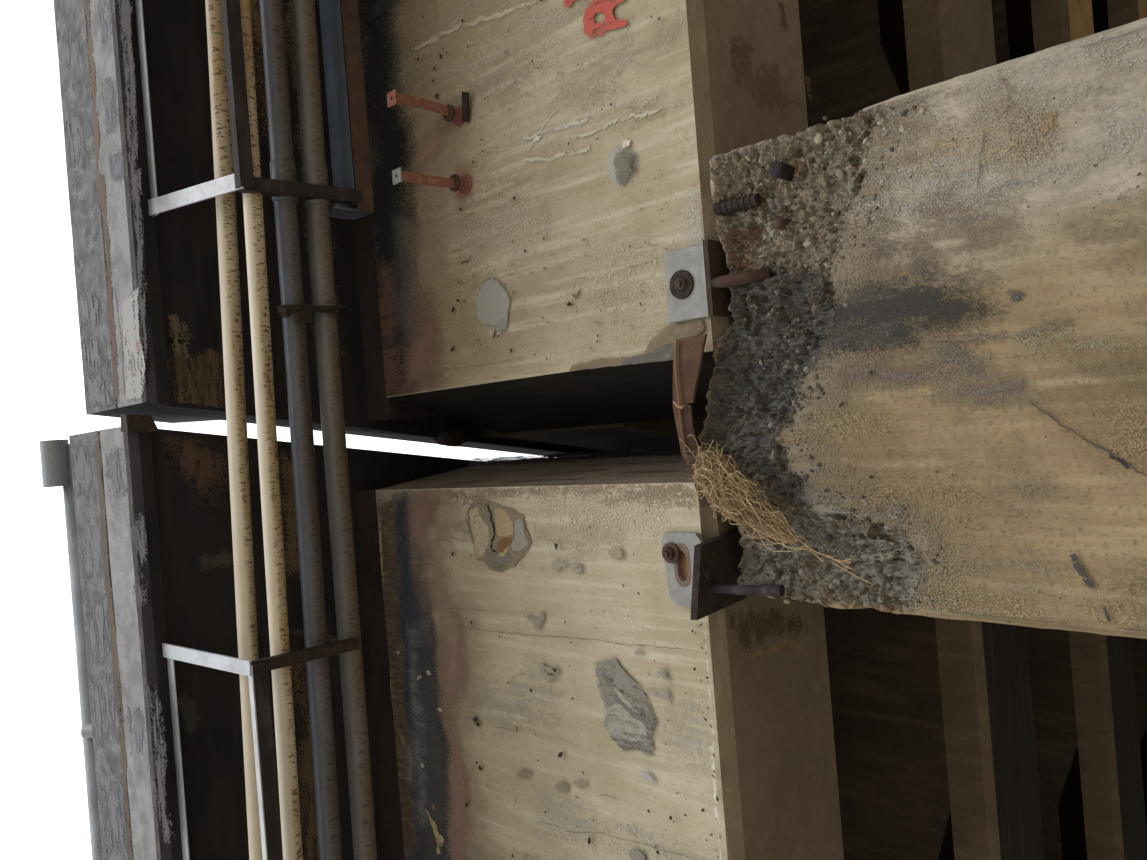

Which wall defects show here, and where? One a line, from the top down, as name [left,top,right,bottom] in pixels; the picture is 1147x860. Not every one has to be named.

spalling [446,498,540,573]
water stain [375,0,702,392]
spalling [609,132,636,188]
spalling [584,645,677,756]
spalling [699,103,944,612]
water stain [776,296,1147,630]